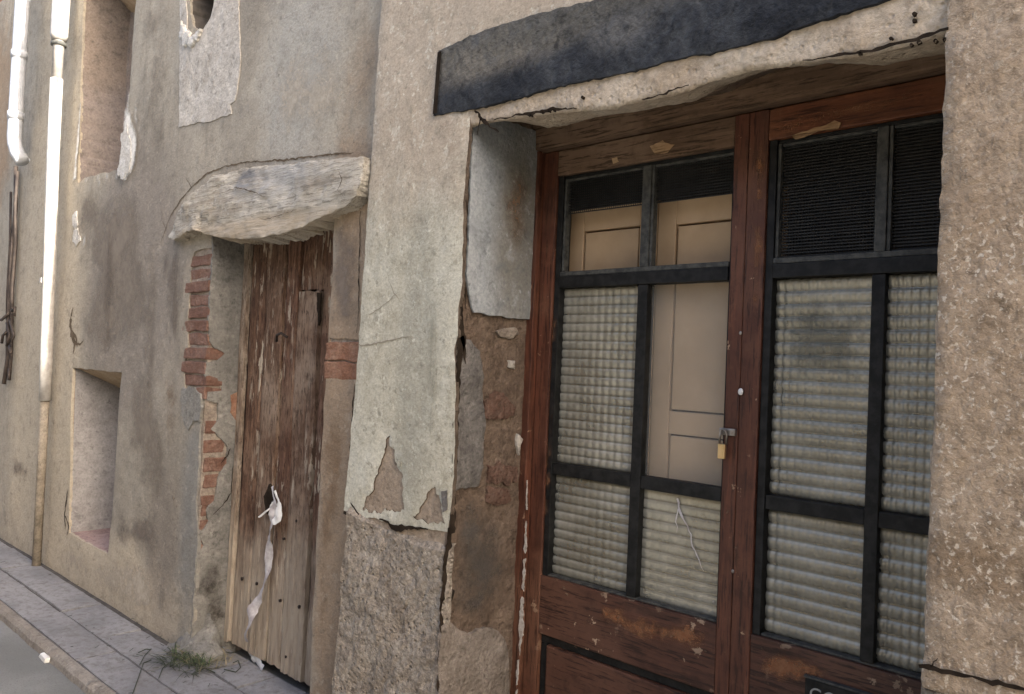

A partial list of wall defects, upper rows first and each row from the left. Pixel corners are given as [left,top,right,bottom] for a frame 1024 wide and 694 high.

flaking render [179,21,203,48]
crack [805,27,949,61]
crack [642,85,689,100]
crack [474,107,577,134]
flaking render [181,254,237,420]
spalling [495,327,519,339]
spalling [515,434,523,455]
flaking render [199,421,227,548]
peeling [363,437,404,513]
peeling [414,488,448,524]
peeling [515,480,528,694]